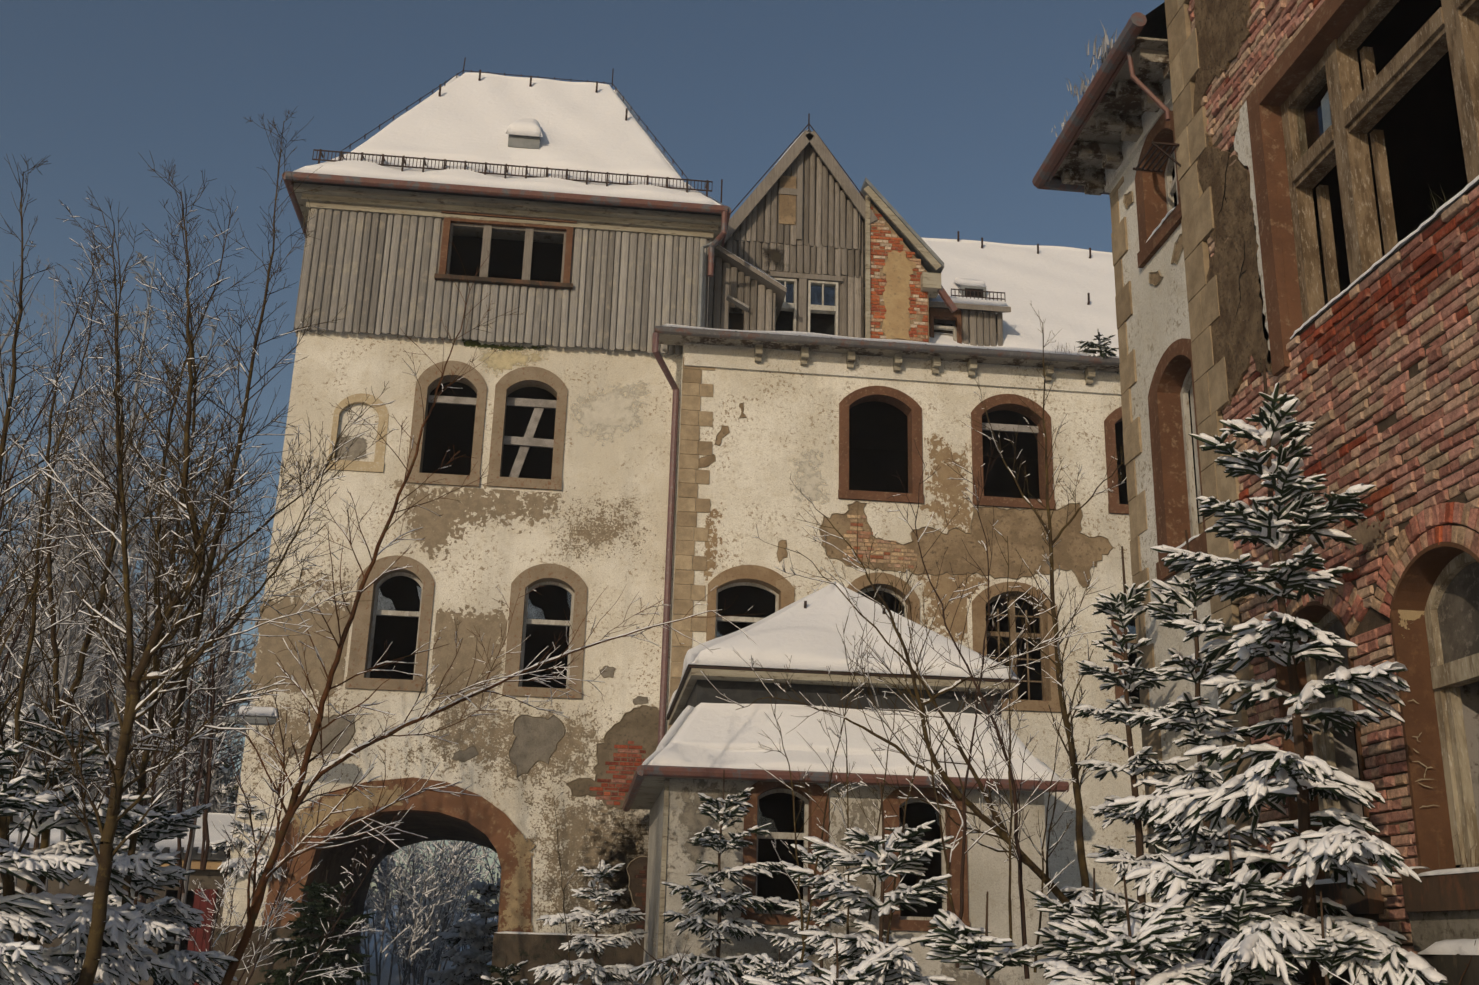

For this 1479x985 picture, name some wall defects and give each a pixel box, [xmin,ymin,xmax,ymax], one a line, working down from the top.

crack [1218,144,1246,317]
peeling [389,479,657,574]
spalling [819,433,1113,644]
peeling [231,552,375,803]
peeling [292,599,659,935]